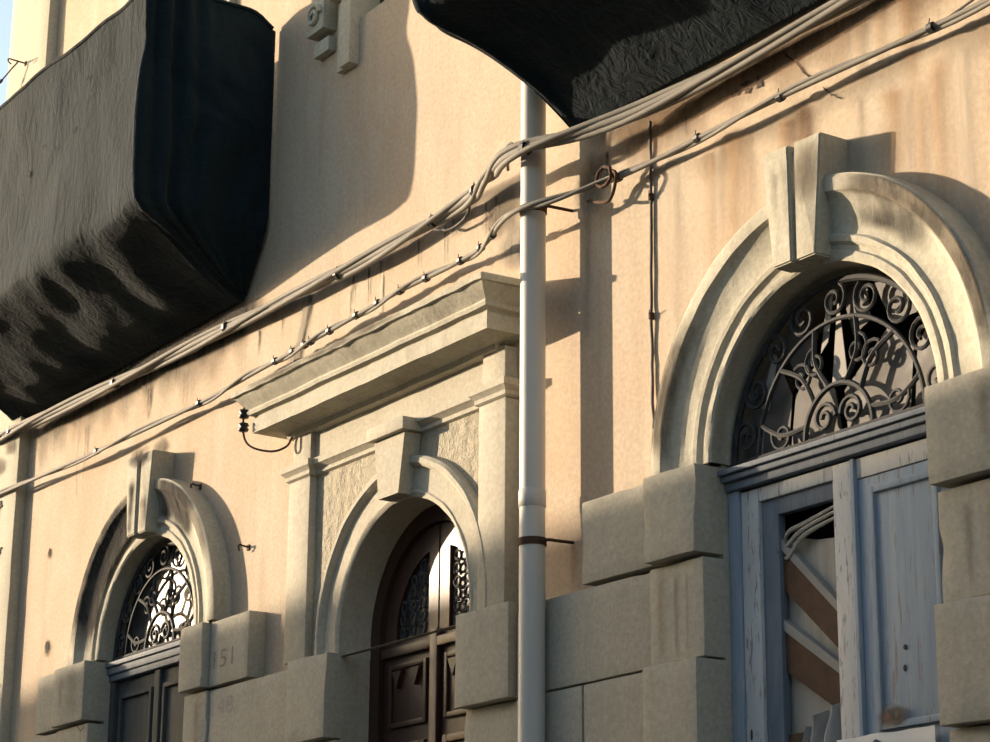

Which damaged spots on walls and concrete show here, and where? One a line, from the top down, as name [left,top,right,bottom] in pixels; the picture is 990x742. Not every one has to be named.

leakage [131,450,143,465]
leakage [159,480,201,542]
leakage [72,484,144,636]